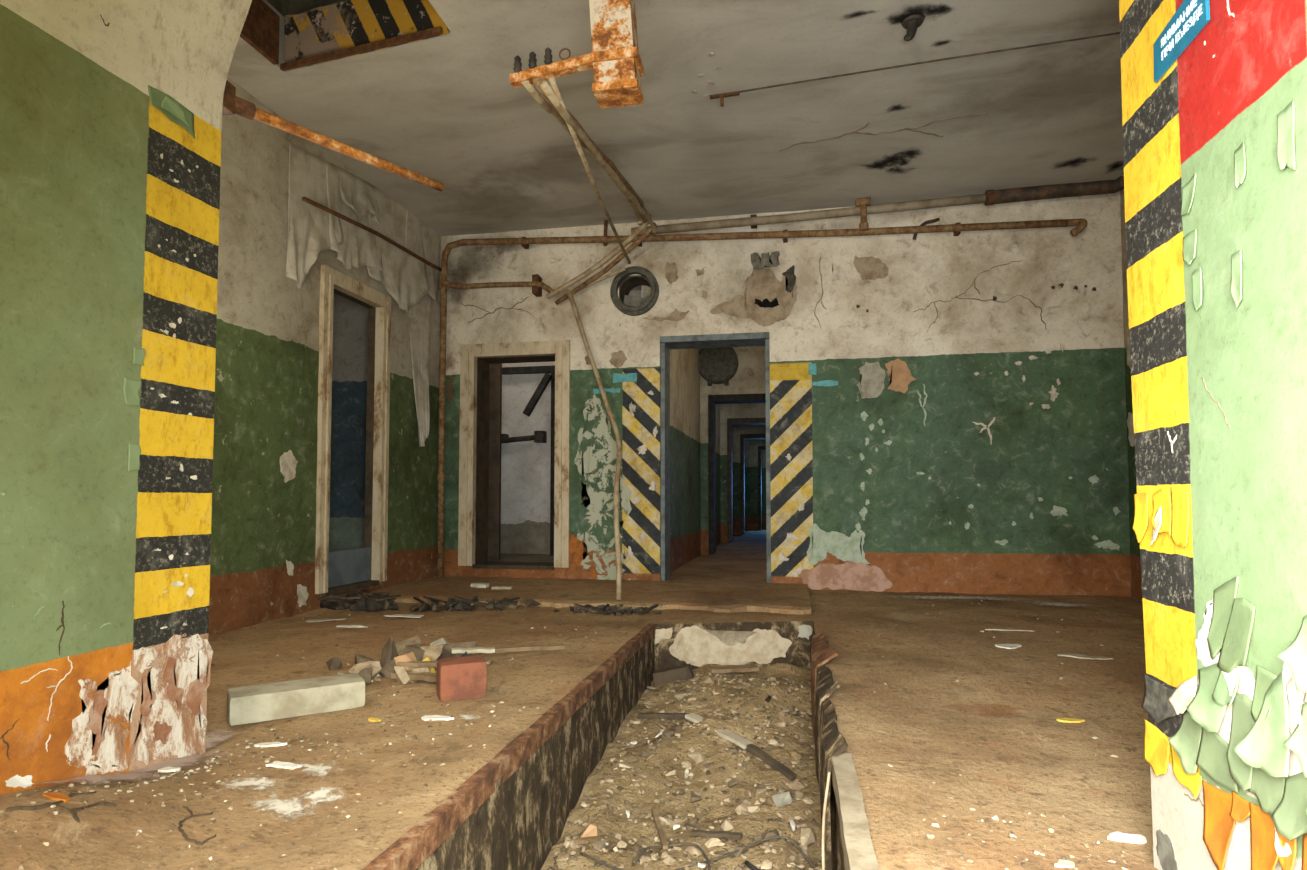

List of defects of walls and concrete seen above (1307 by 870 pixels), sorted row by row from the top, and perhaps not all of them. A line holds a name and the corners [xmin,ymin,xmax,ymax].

damp [928,5,951,14]
damp [862,150,919,173]
peeling [1180,172,1197,215]
peeling [286,143,440,447]
flaking render [695,251,797,326]
peeling [574,394,658,580]
peeling [779,359,916,592]
peeling [995,497,1068,546]
flaking render [64,623,213,775]
spalling [416,624,815,870]
spalling [830,771,845,870]
peeling [1141,576,1307,870]